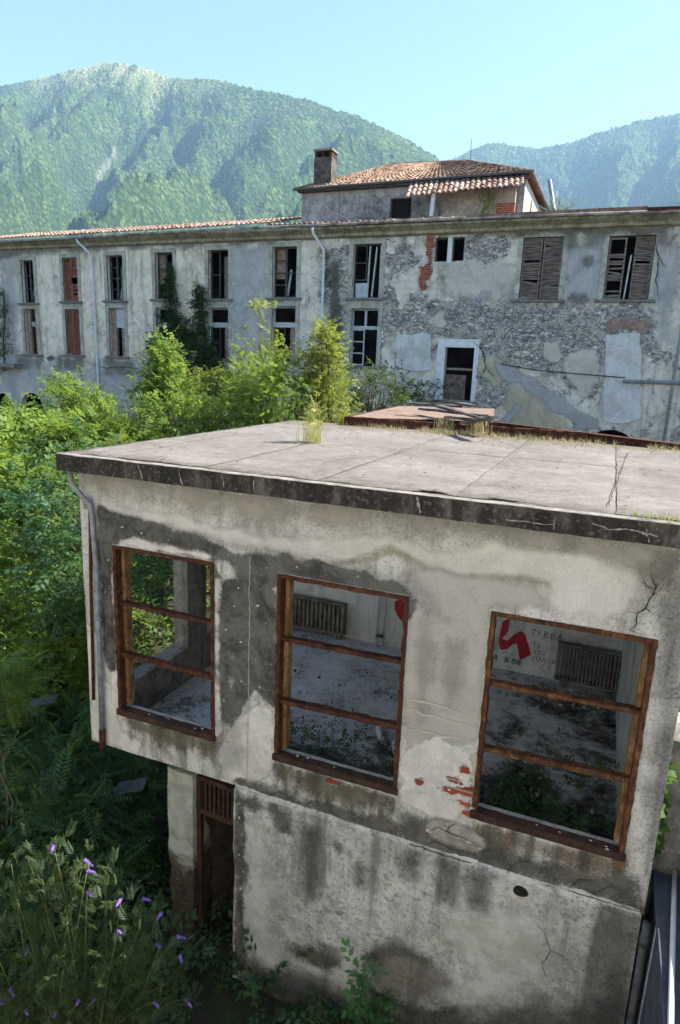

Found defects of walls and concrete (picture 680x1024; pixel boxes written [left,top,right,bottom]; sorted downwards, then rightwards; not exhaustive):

leakage [325,253,342,345]
flaking render [418,235,520,302]
flaking render [605,316,650,334]
crack [609,453,673,519]
leakage [82,473,679,726]
crack [629,572,659,635]
flaking render [398,736,474,821]
leakage [304,828,319,898]
crack [407,841,474,864]
crack [543,879,639,912]
leakage [242,942,598,1024]
crack [533,920,574,987]